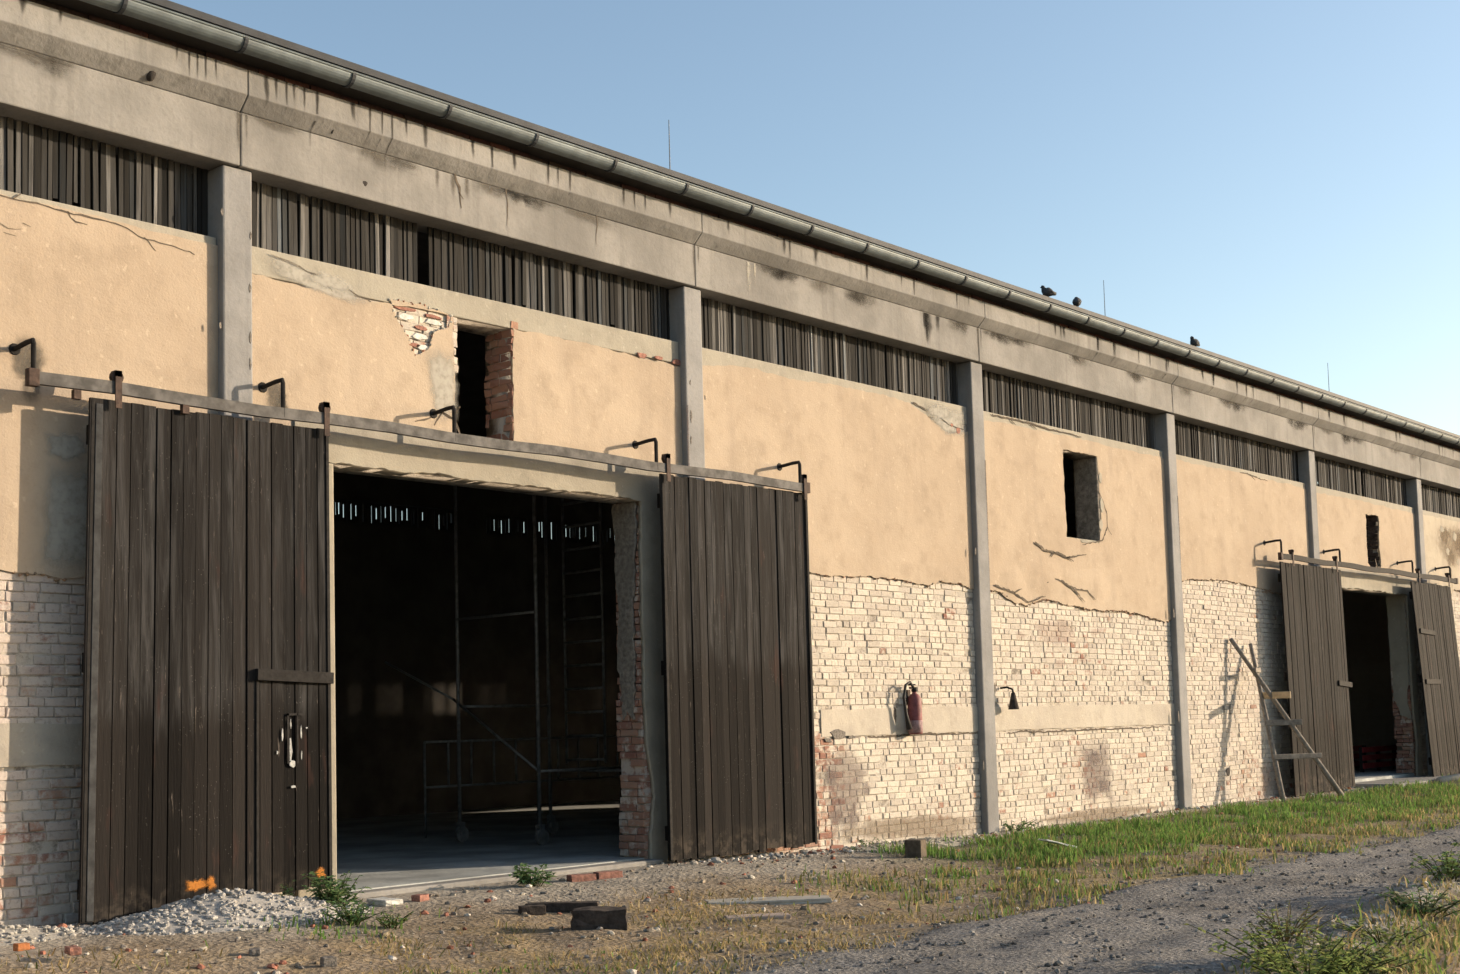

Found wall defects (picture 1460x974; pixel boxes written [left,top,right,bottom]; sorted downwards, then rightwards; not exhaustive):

crack [0,193,195,255]
flaking render [383,298,459,373]
crack [995,488,1112,603]
flaking render [0,571,85,724]
flaking render [715,572,1294,858]
flaking render [0,768,92,952]